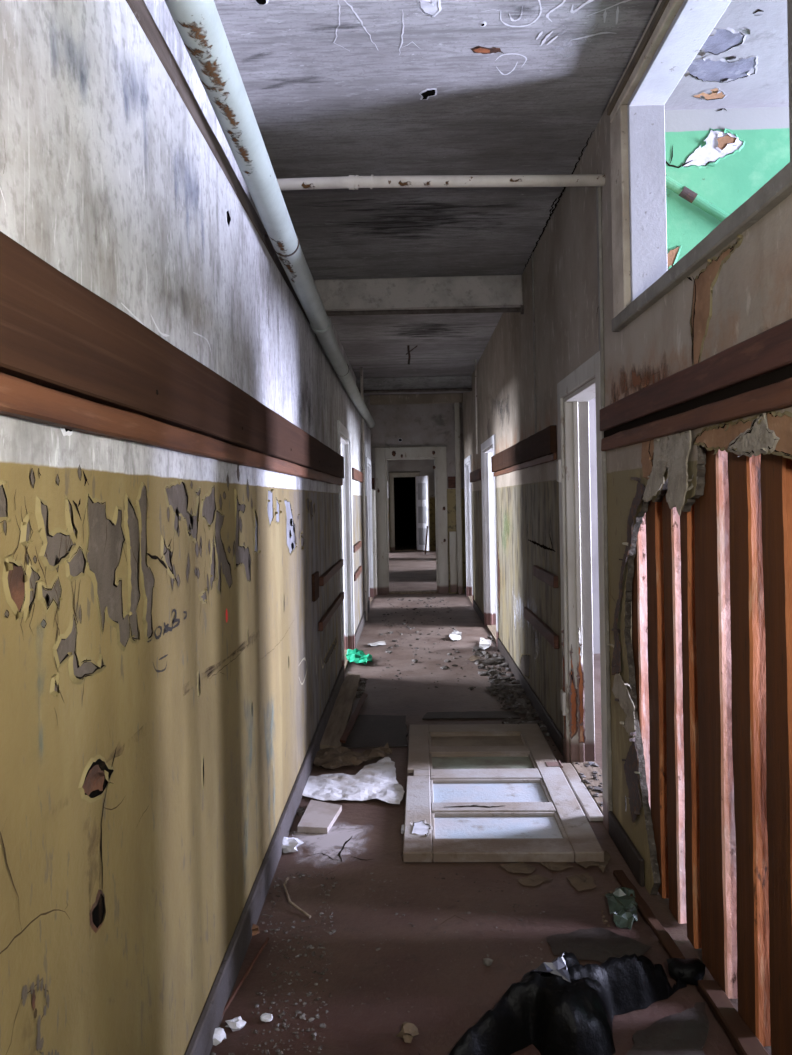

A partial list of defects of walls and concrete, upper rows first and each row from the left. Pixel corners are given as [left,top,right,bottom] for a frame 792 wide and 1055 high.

corrosion [179,22,252,174]
peeling [680,128,745,169]
peeling [684,27,758,101]
spalling [694,411,792,459]
peeling [0,464,304,702]
spalling [78,747,117,933]